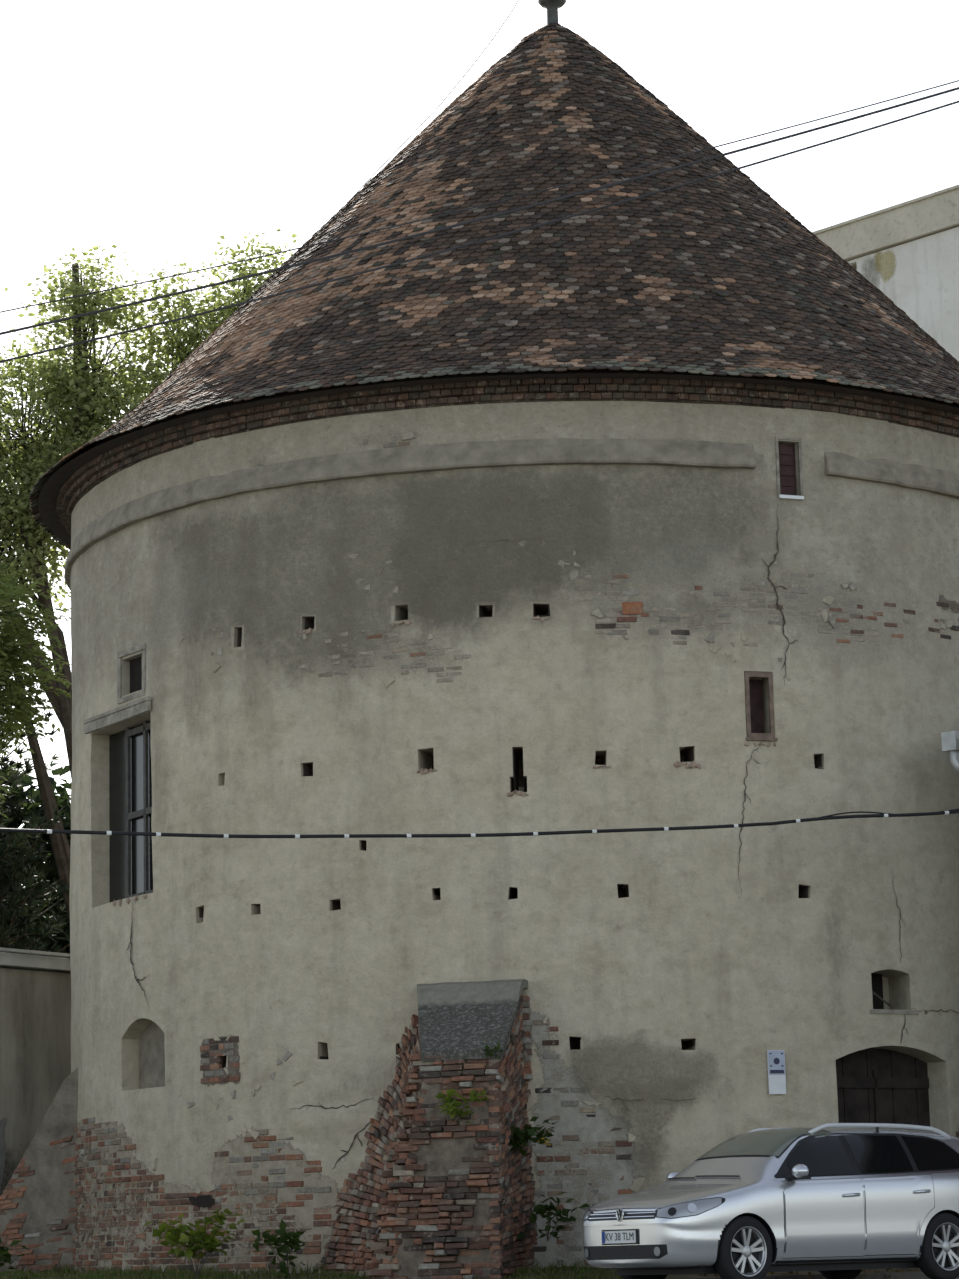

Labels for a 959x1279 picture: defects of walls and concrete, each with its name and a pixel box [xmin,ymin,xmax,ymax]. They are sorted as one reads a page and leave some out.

flaking render [294,620,471,689]
flaking render [590,602,690,640]
crack [762,508,799,686]
flaking render [820,595,916,644]
flaking render [928,595,959,639]
crack [738,746,762,894]
crack [126,897,148,1004]
flaking render [72,1033,349,1275]